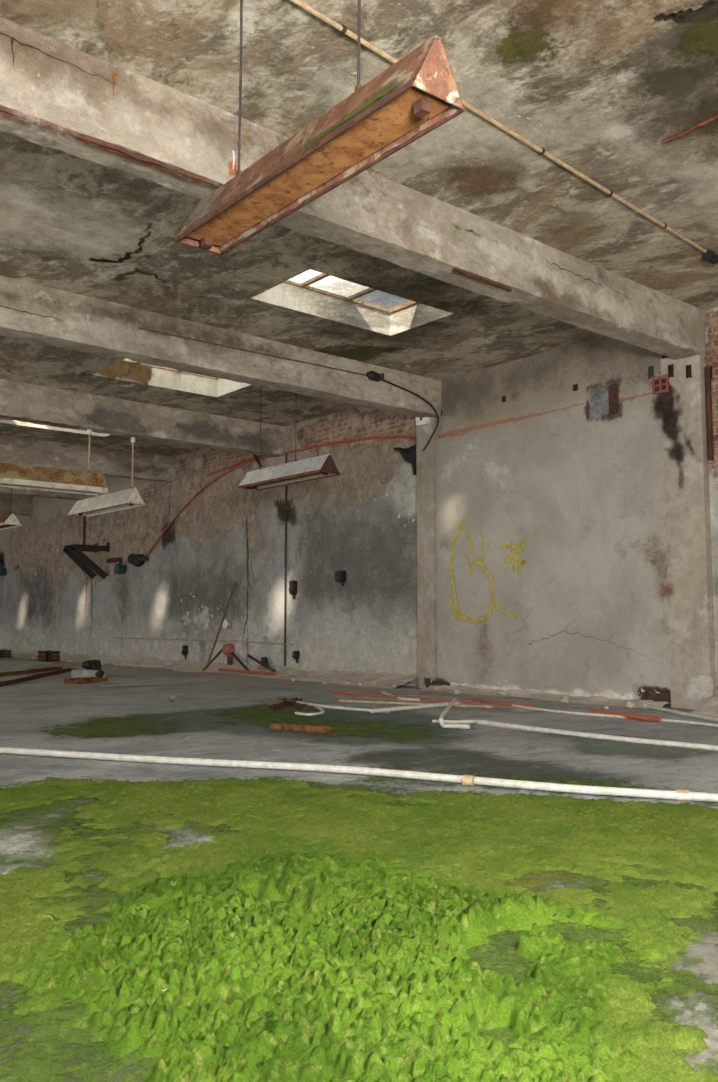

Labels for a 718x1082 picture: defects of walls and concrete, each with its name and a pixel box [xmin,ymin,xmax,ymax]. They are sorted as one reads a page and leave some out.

leakage [625,6,718,134]
leakage [23,571,61,627]
peeling [0,408,417,585]
leakage [169,510,260,635]
leakage [299,503,417,611]
leakage [655,405,692,485]
flaking render [705,310,718,491]